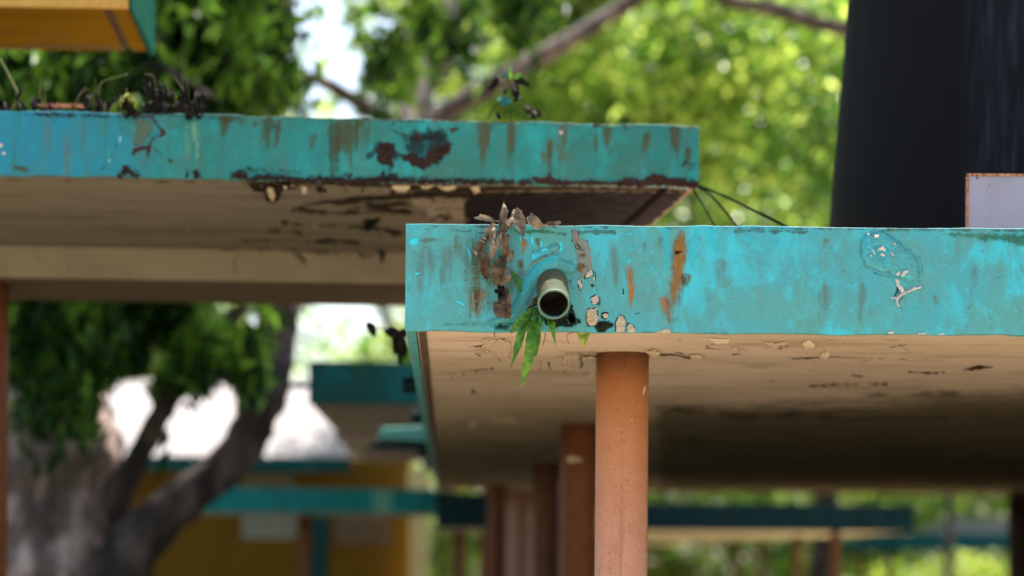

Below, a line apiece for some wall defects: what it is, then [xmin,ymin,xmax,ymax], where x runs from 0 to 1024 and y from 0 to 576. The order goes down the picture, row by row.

rust [230,118,699,189]
spalling [248,180,686,234]
peeling [519,229,638,333]
rust [660,231,690,323]
peeling [646,329,789,363]